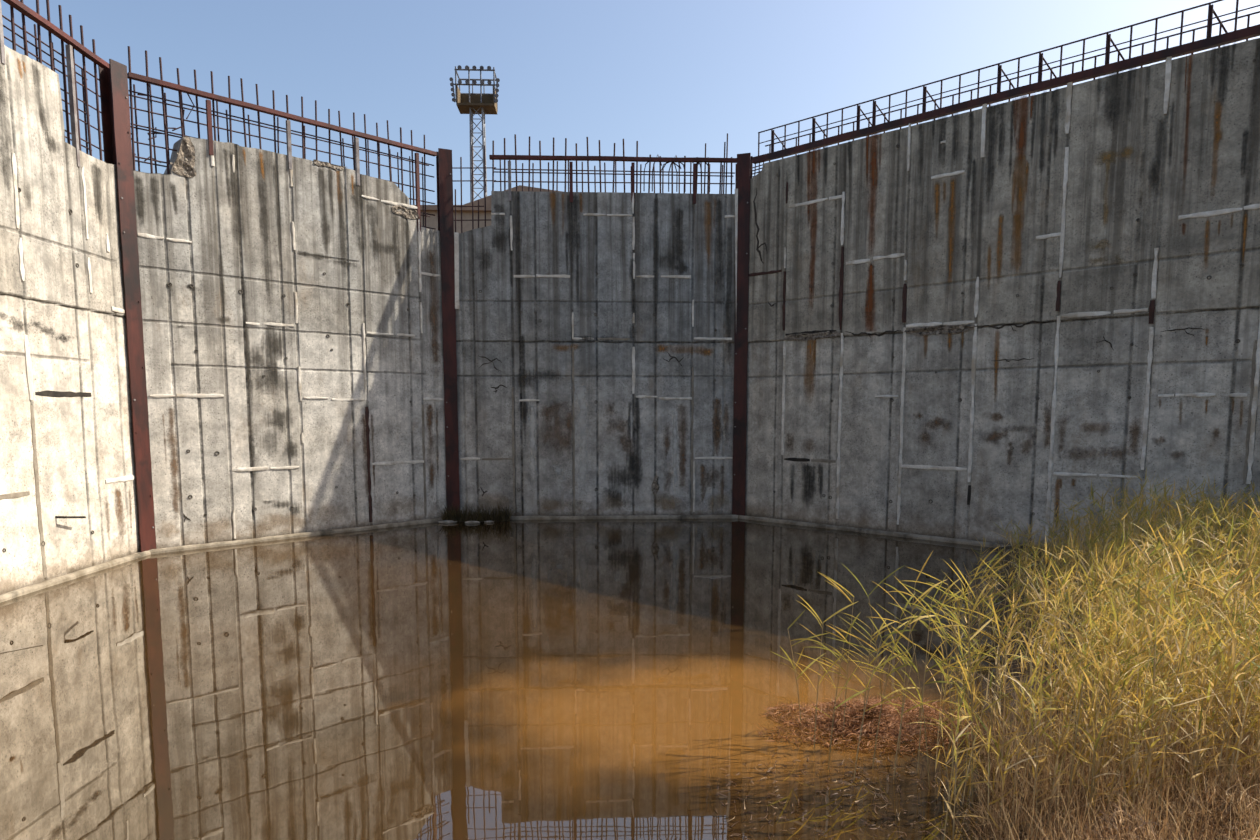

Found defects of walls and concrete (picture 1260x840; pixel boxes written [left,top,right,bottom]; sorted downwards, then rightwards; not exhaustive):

damp [220,256,229,323]
damp [259,165,280,247]
spalling [128,46,436,229]
spalling [452,133,764,233]
damp [653,198,687,295]
corrosion [807,148,820,299]
corrosion [865,132,881,332]
corrosion [935,180,955,279]
corrosion [988,96,1033,279]
corrosion [1214,104,1222,150]
damp [245,309,283,476]
damp [268,411,297,457]